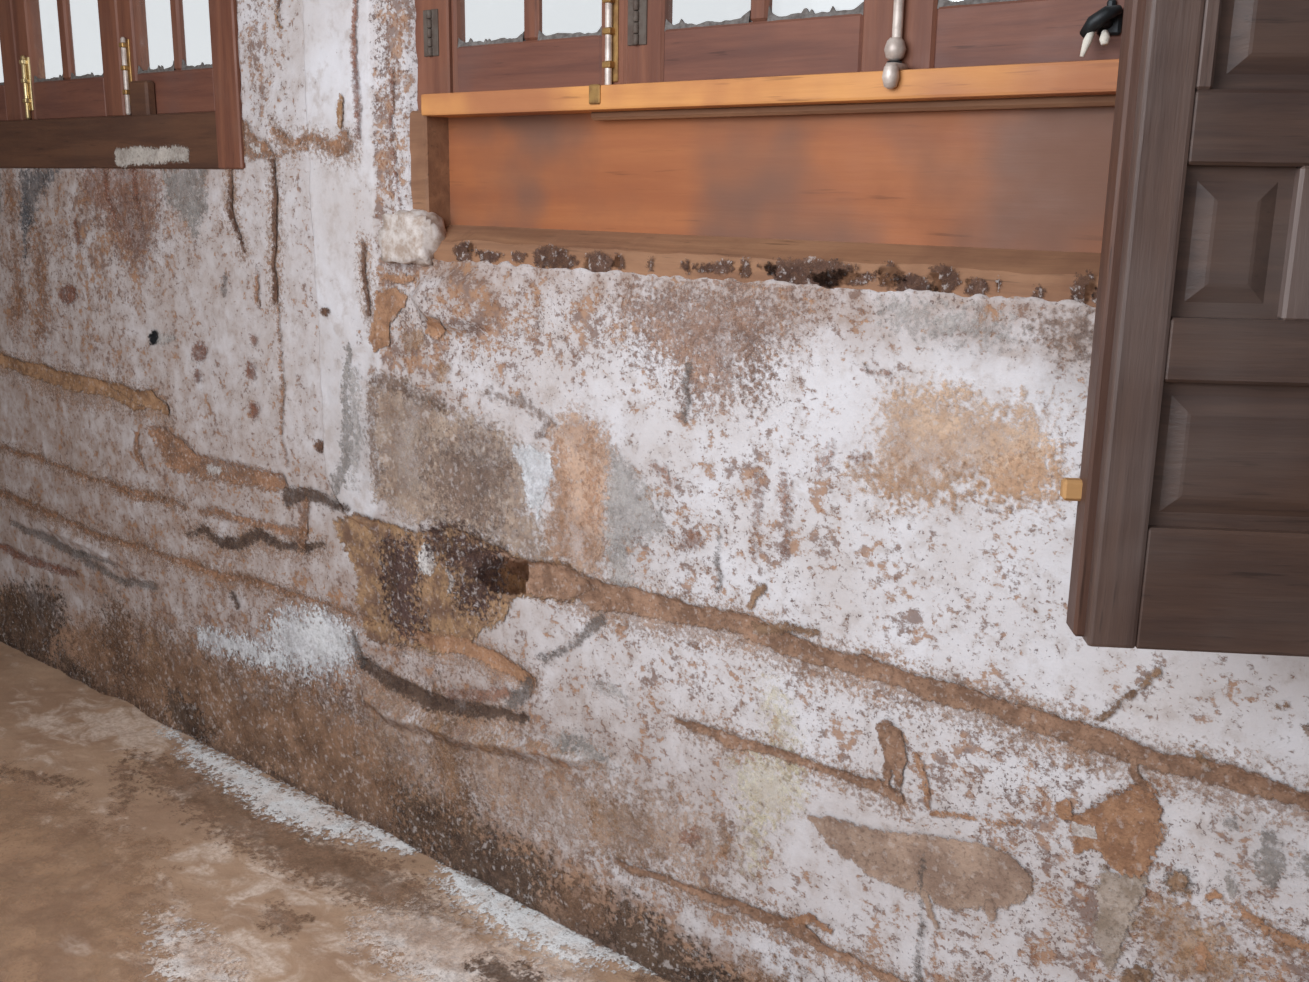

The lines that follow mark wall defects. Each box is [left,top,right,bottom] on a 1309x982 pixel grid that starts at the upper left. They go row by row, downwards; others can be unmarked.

crack [387,67,402,204]
crack [220,0,362,467]
crack [354,233,375,321]
crack [0,350,175,428]
crack [680,362,692,423]
spalling [333,511,593,659]
crack [0,442,1309,831]
damp [0,576,822,982]
spalling [807,815,1033,929]
spalling [1054,780,1255,982]
damp [1225,863,1240,900]
damp [1252,826,1309,889]